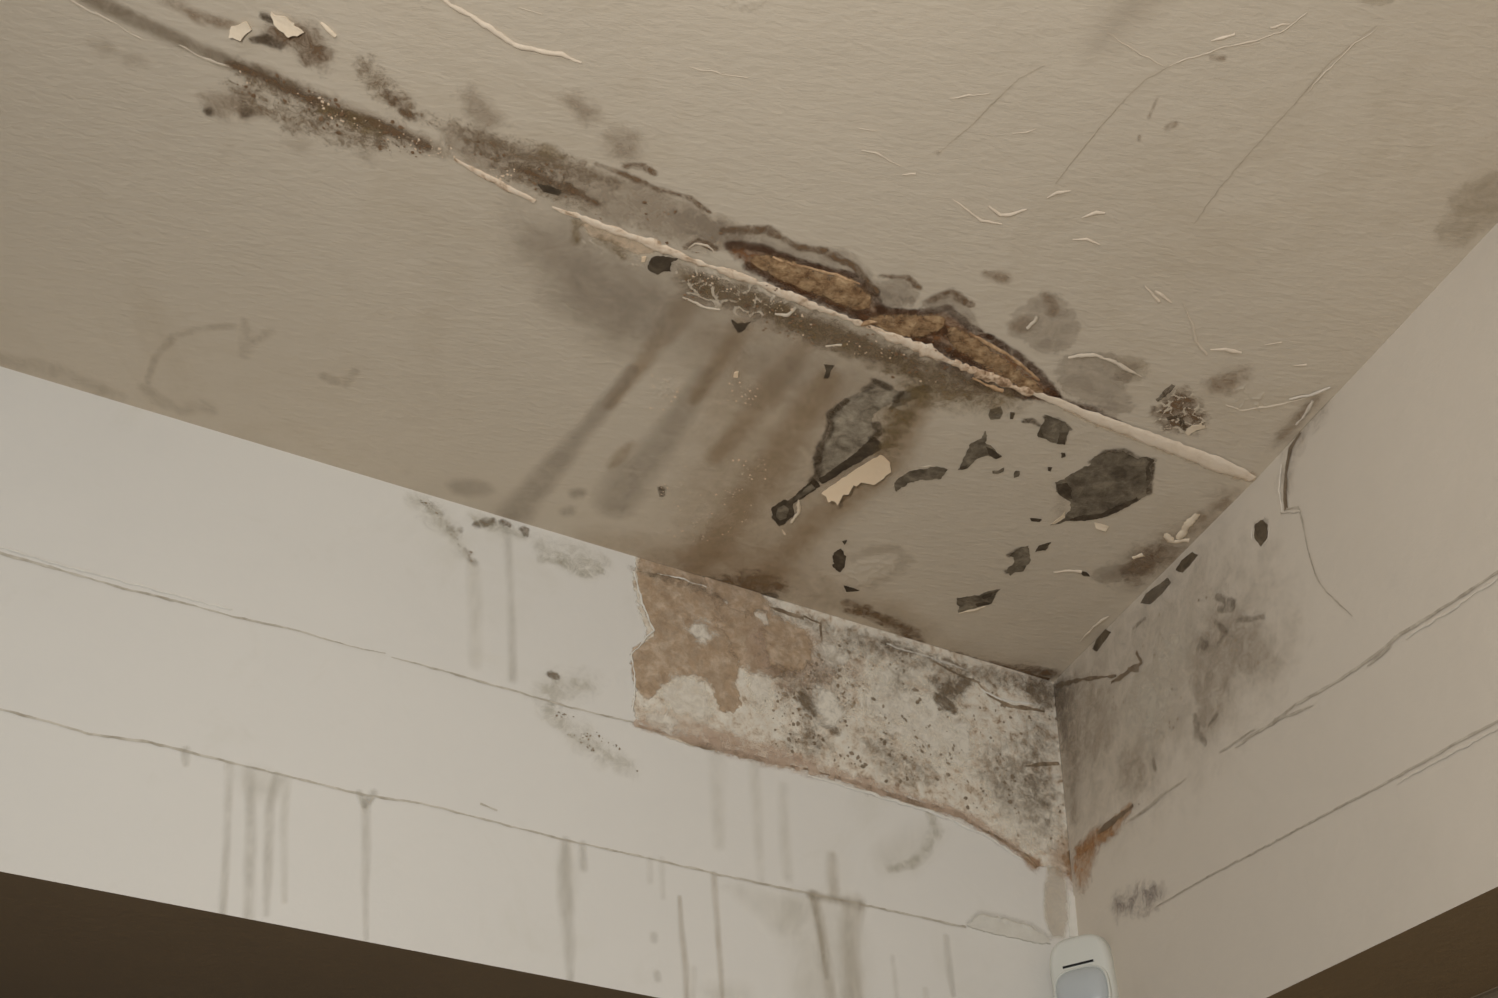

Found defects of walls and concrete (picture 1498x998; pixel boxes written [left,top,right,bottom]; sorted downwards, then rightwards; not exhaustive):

peeling [229,12,337,66]
damp [226,62,972,307]
damp [473,519,529,537]
peeling [731,319,751,333]
flaking render [751,255,1155,614]
damp [1068,353,1142,377]
crack [1278,432,1352,616]
crack [0,546,1038,868]
damp [845,600,921,642]
crack [886,642,1143,712]
crack [1219,570,1498,753]
crack [0,708,966,928]